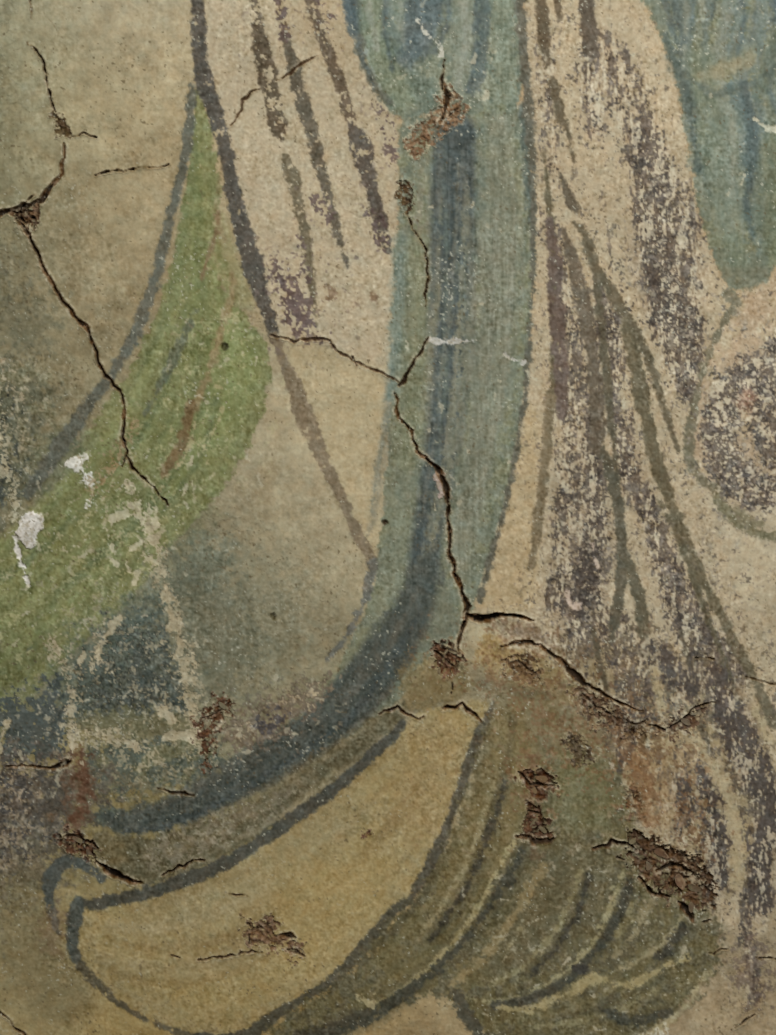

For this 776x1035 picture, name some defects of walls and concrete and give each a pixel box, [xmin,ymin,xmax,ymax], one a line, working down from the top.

crack [27,0,57,114]
crack [439,59,447,91]
crack [0,132,171,508]
crack [407,216,431,309]
peeling [0,375,45,588]
peeling [65,426,240,775]
crack [269,334,668,733]
peeling [49,612,151,756]
crack [745,676,776,687]
spalling [511,765,562,848]
spalling [591,782,725,925]
spalling [236,908,307,967]